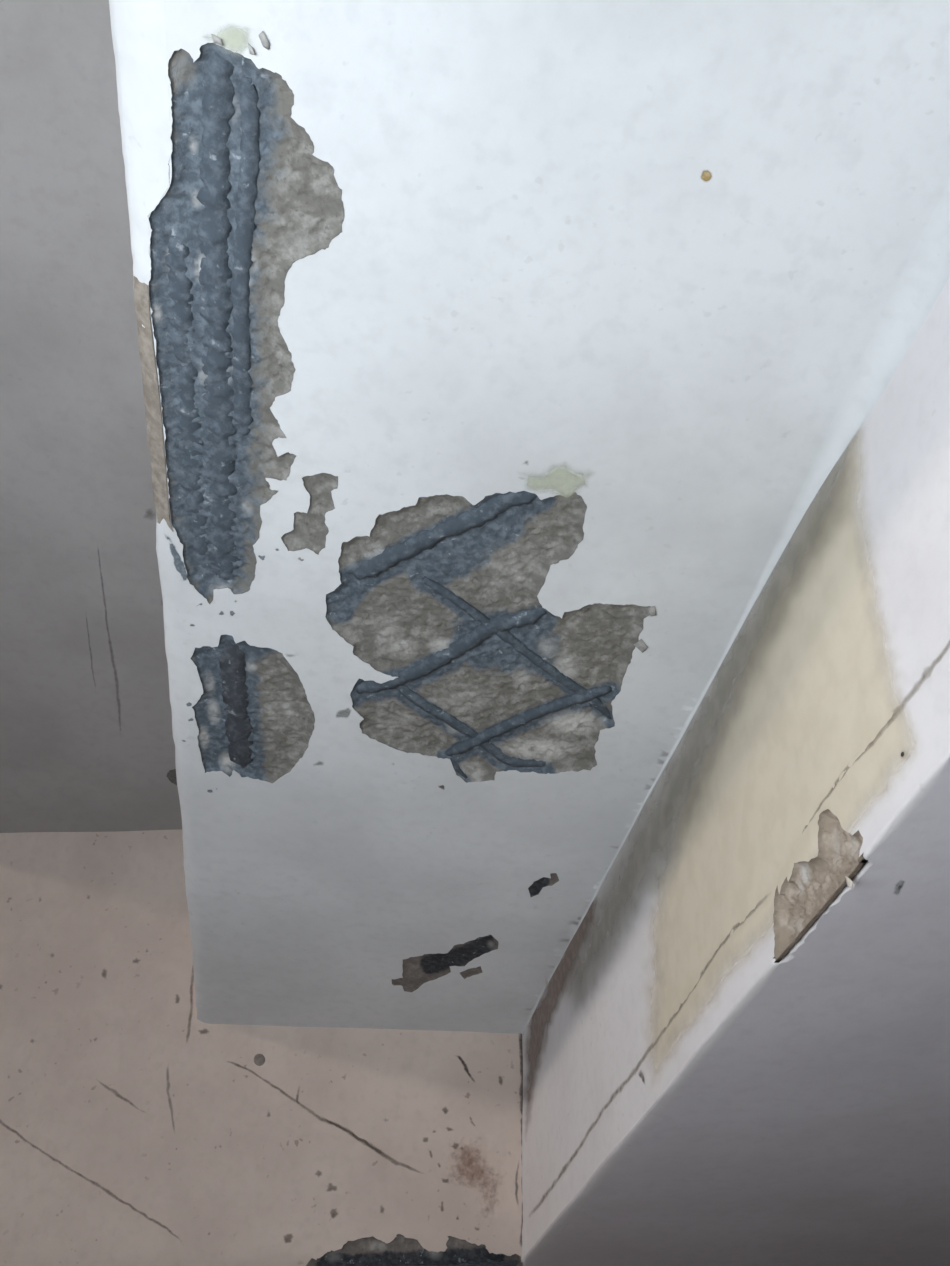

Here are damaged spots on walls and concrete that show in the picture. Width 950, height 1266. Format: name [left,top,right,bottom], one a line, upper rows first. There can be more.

spalling [133,28,345,616]
spalling [325,467,657,783]
spalling [183,634,315,783]
leakage [527,448,911,1103]
crack [805,646,948,828]
peeling [528,873,559,897]
spalling [773,809,868,963]
peeling [392,935,499,992]
crack [0,1121,170,1231]
crack [236,1064,416,1171]
spalling [306,1234,521,1266]
crack [515,903,760,1245]